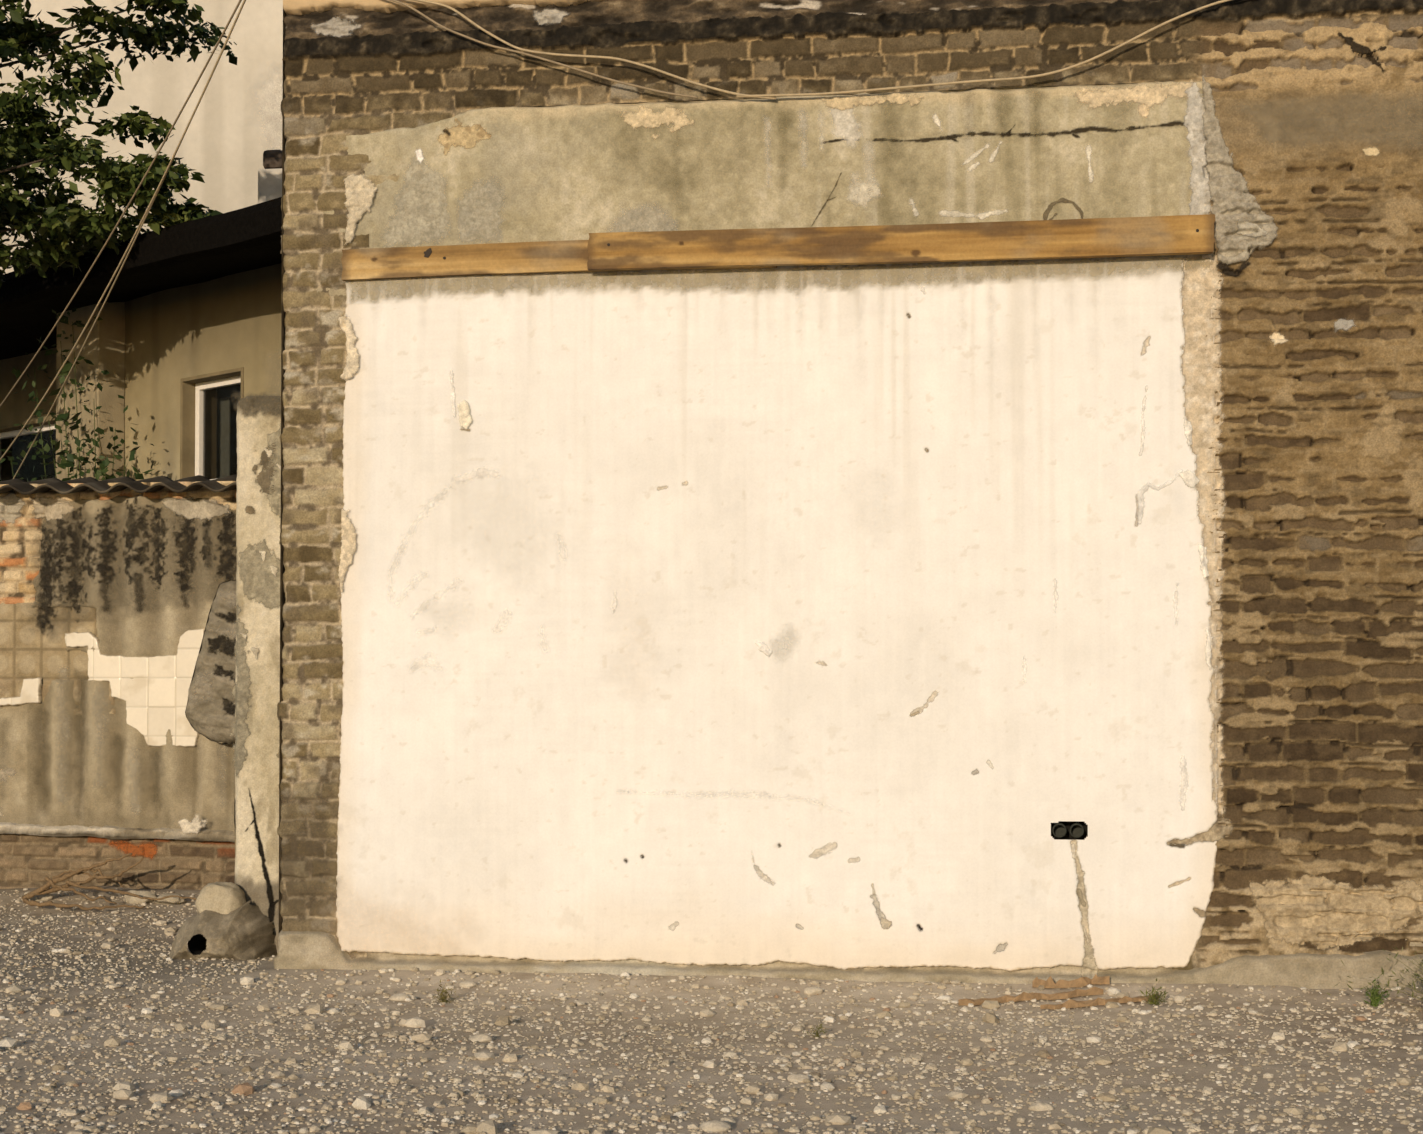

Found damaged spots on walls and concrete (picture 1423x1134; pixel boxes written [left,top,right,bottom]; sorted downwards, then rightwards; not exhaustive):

spalling [438,119,491,155]
spalling [620,107,694,139]
crack [812,121,1184,225]
leakage [178,815,206,833]
crack [245,790,279,922]
spalling [1250,874,1423,952]